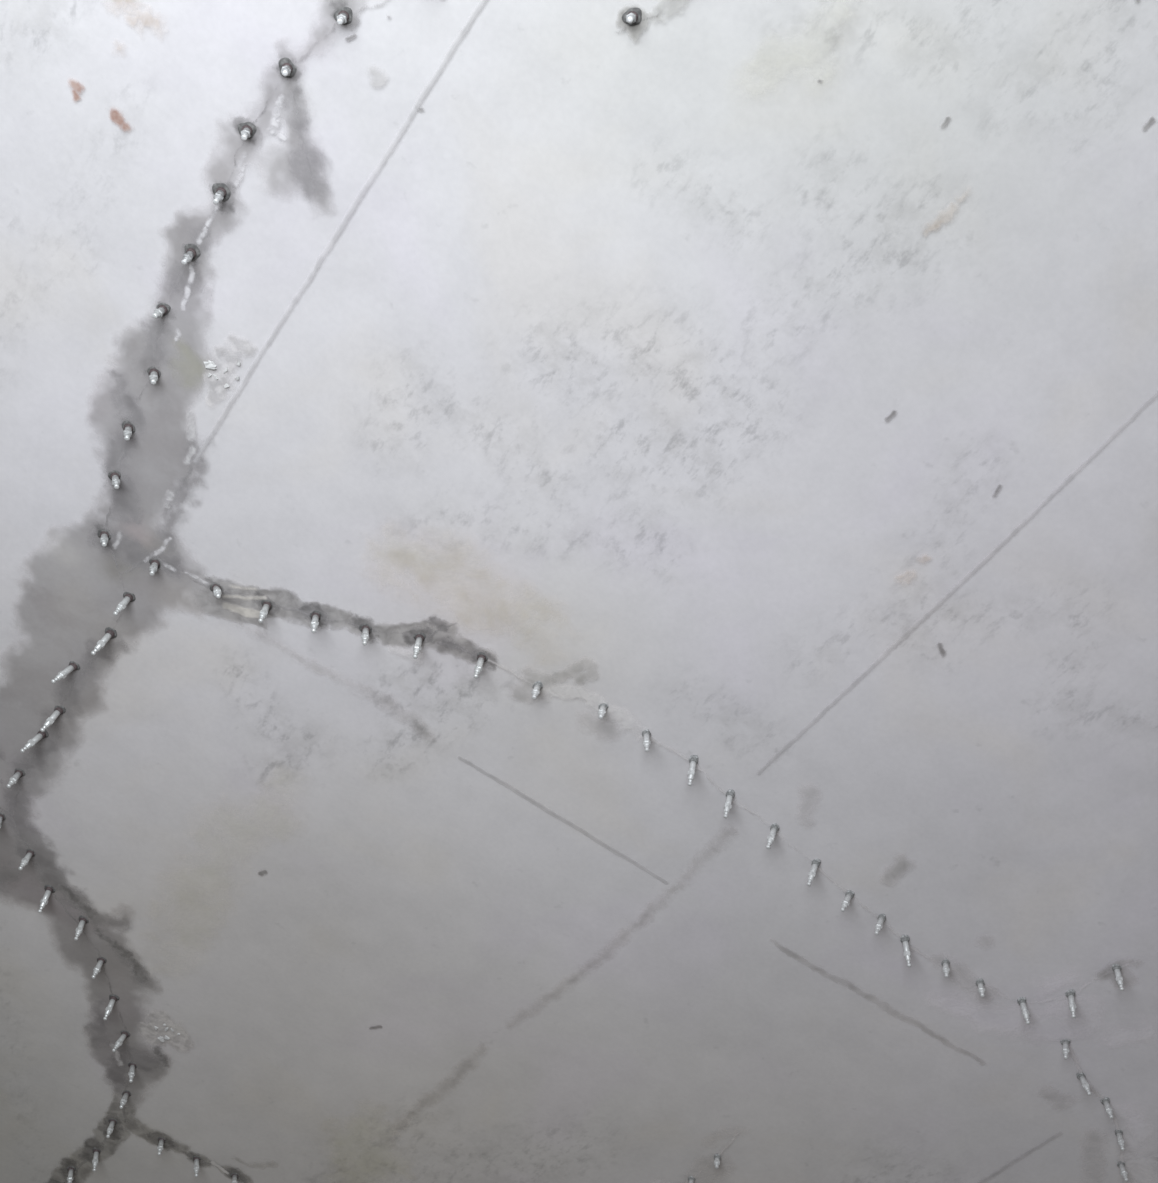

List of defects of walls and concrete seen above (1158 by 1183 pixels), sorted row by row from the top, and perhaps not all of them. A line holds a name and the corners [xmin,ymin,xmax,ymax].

corrosion [69,80,84,101]
corrosion [110,109,130,131]
leakage [0,0,551,1183]
leakage [513,658,644,739]